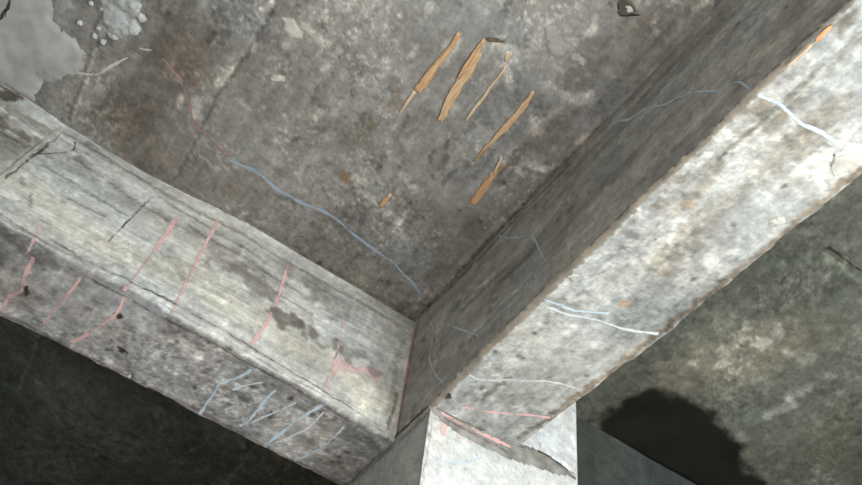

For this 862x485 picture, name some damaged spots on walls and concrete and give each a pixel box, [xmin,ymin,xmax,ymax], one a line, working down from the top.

crack [0,0,11,20]
damp [88,0,147,45]
spalling [617,0,639,17]
crack [78,48,420,293]
crack [70,217,178,343]